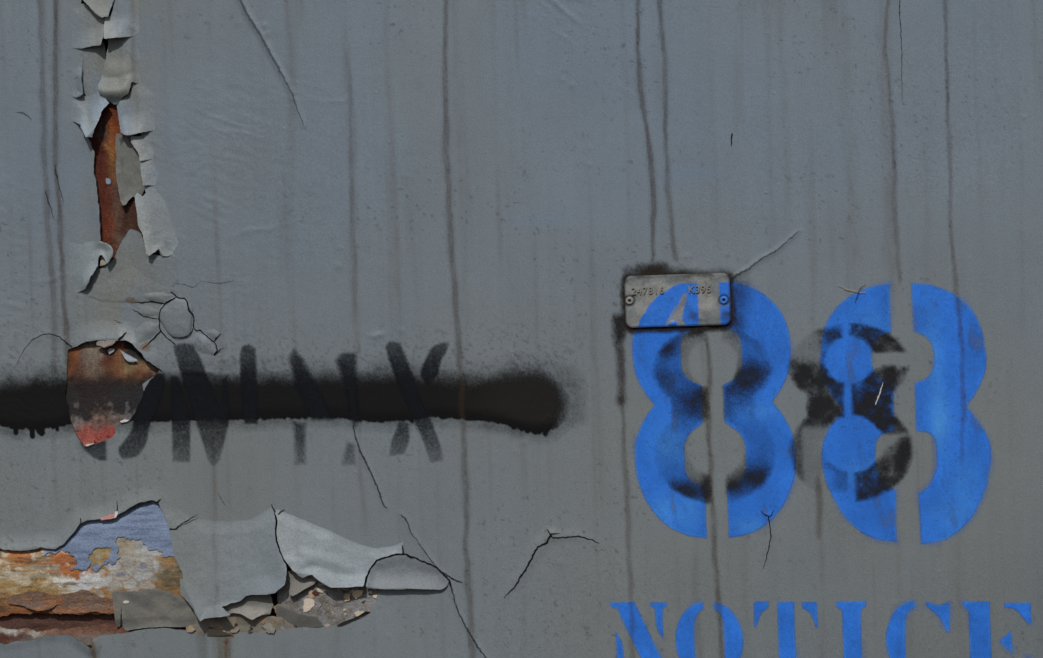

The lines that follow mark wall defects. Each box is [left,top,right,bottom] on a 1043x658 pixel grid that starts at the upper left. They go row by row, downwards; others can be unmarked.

peeling [69,0,179,303]
rust [17,332,162,446]
rust [0,499,461,658]
crack [353,425,486,658]
crack [504,529,598,598]
crack [762,510,774,568]